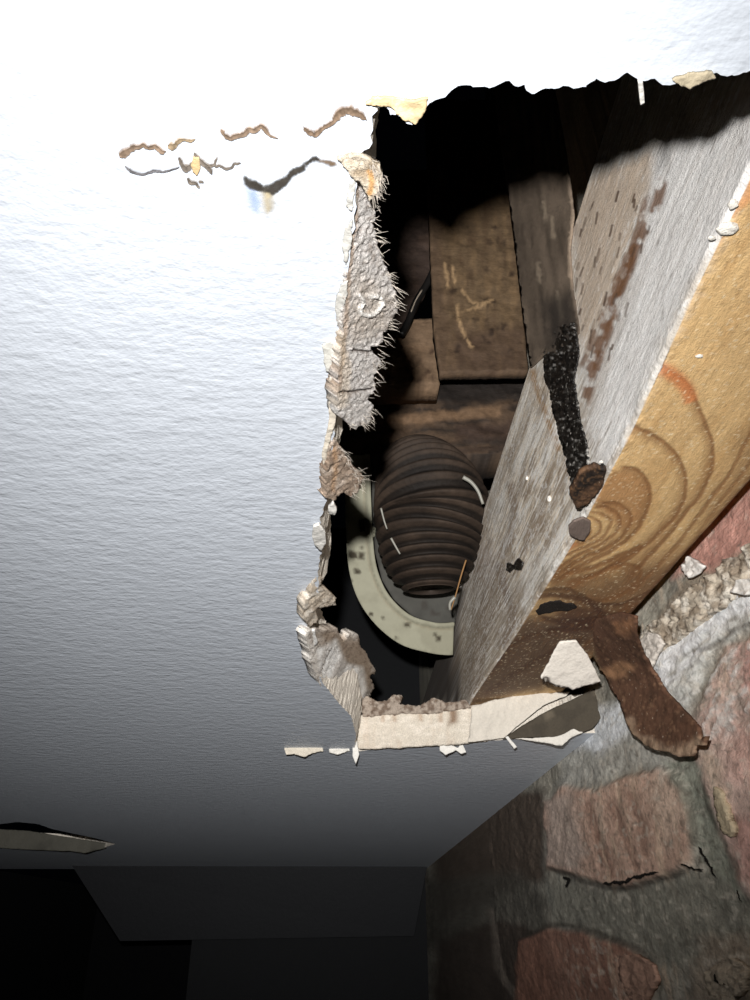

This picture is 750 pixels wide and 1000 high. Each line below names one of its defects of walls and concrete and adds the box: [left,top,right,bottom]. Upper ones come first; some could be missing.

peeling [637,79,645,105]
crack [119,105,367,195]
spalling [317,175,408,516]
peeling [312,522,326,551]
peeling [681,556,706,578]
peeling [729,578,750,595]
peeling [640,632,666,667]
spalling [284,574,517,764]
crack [681,846,716,877]
crack [603,871,658,885]